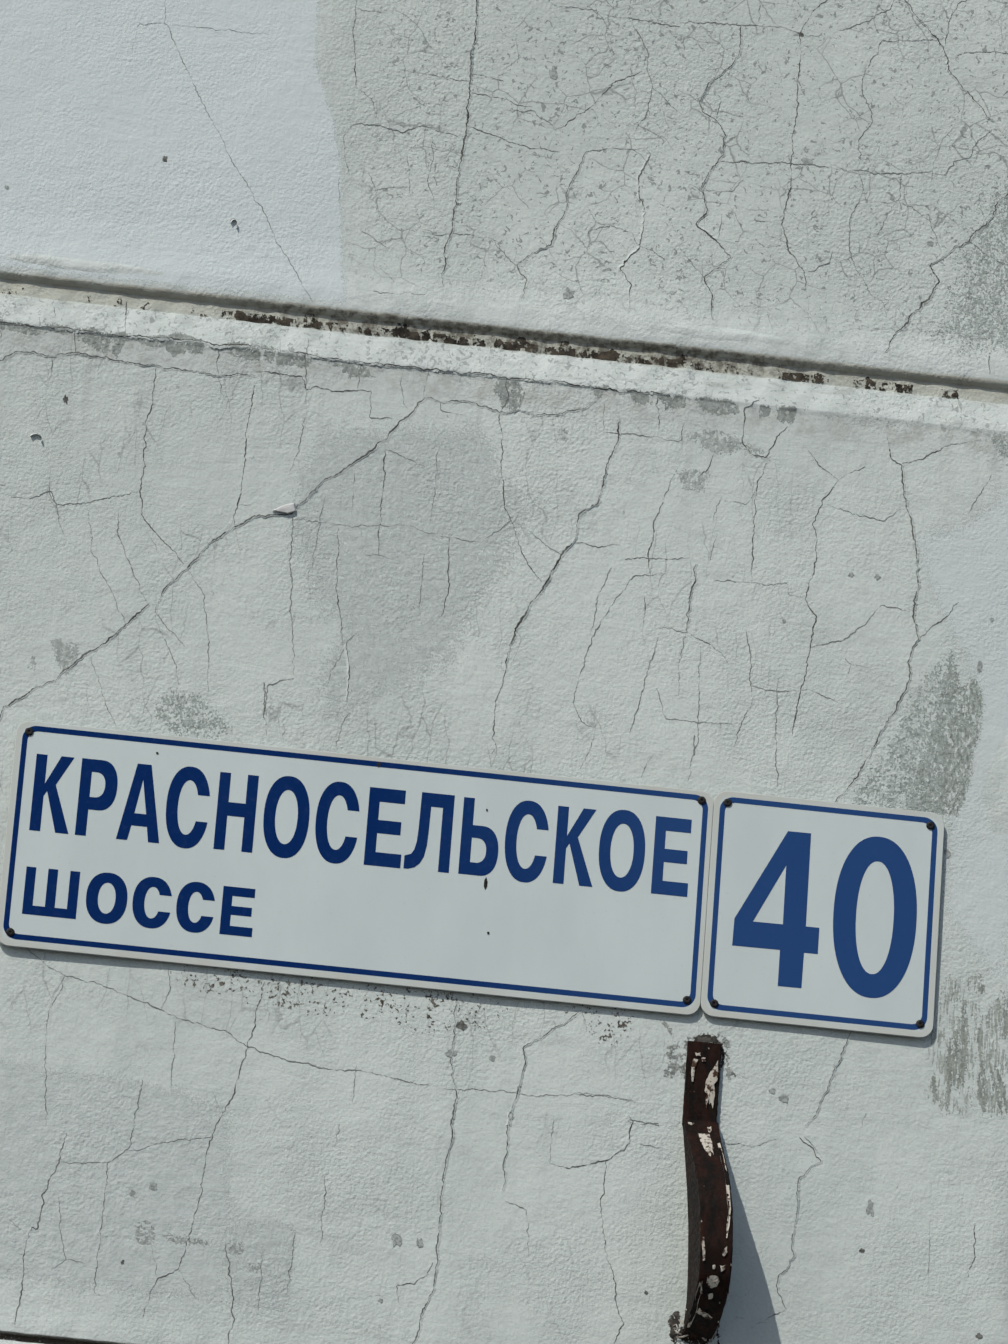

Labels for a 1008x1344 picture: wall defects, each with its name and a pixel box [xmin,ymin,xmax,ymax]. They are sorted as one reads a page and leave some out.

crack [134,7,310,296]
crack [339,0,1008,353]
crack [0,301,971,803]
peeling [850,649,986,817]
crack [9,948,665,1344]
crack [724,1032,853,1324]